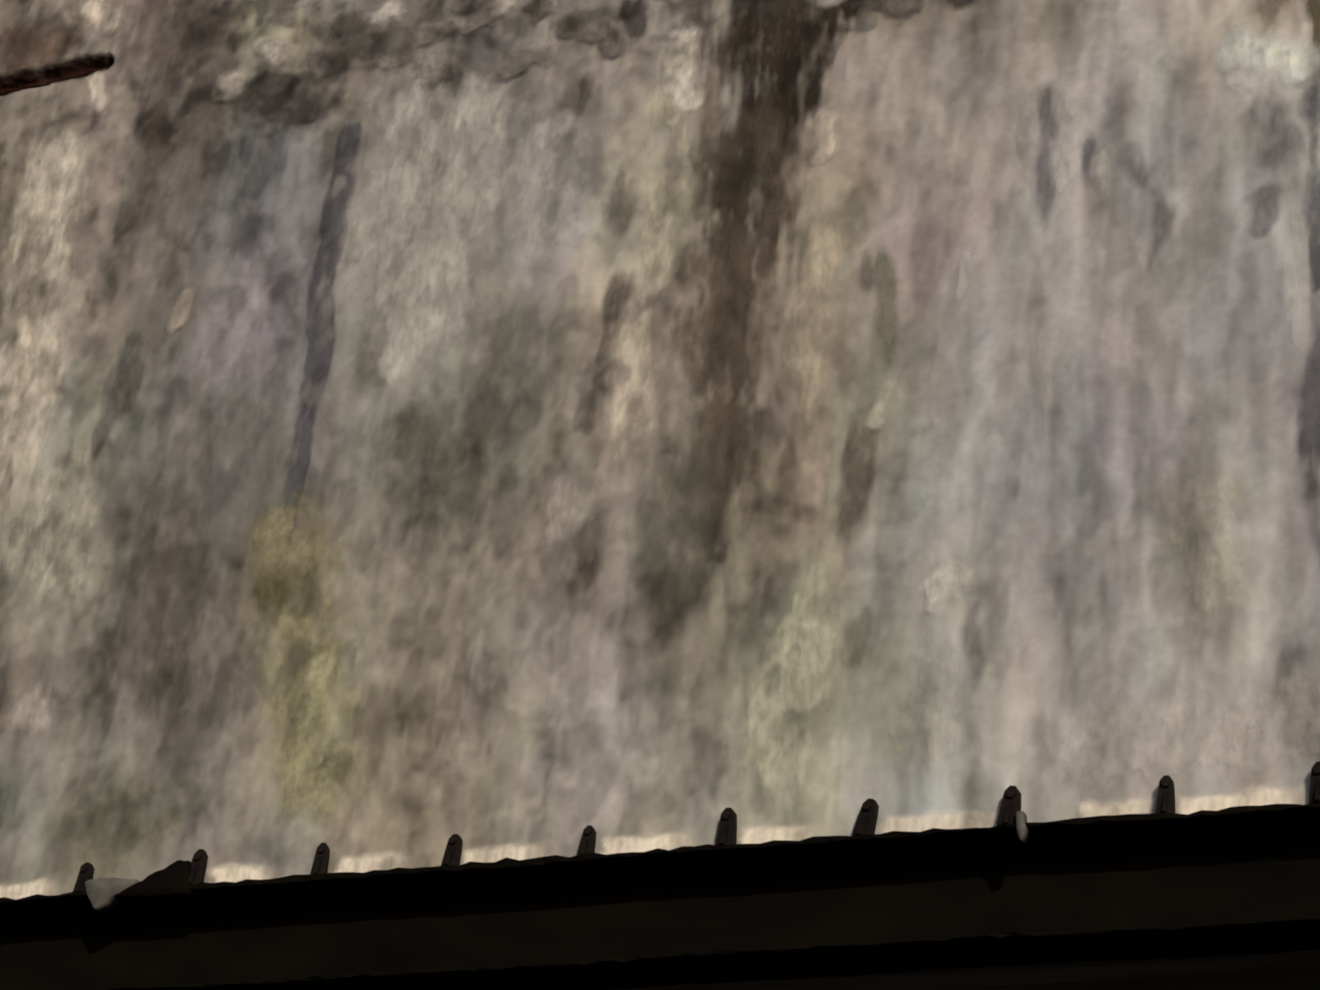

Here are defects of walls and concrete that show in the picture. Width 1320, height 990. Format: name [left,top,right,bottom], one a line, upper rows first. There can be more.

corrosion [0,24,80,69]
water stain [1220,0,1320,165]
water stain [581,0,864,560]
water stain [863,254,896,349]
water stain [1284,175,1320,490]
water stain [838,381,895,531]
water stain [545,479,602,596]
water stain [923,561,973,611]
water stain [744,563,869,794]
water stain [888,650,962,760]